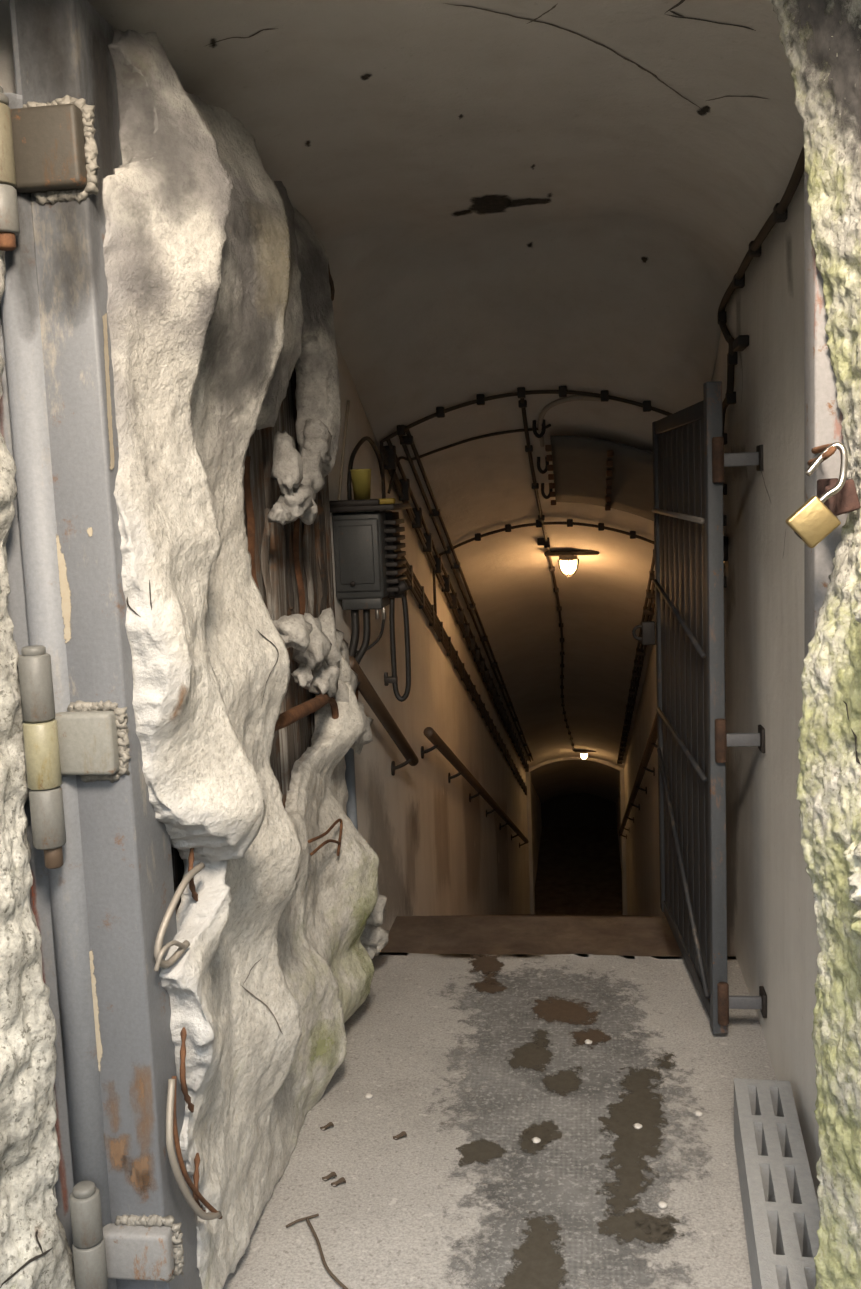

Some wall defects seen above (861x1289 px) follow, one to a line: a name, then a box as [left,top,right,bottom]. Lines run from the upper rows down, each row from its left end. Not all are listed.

crack [445,3,767,114]
corrosion [188,848,198,902]
leakage [468,954,507,994]
corrosion [180,1027,194,1113]
leakage [508,996,611,1097]
corrosion [109,1071,152,1192]
corrosion [193,1153,206,1212]
leakage [456,1120,562,1167]
leakage [595,1052,685,1248]
leakage [499,1211,573,1289]